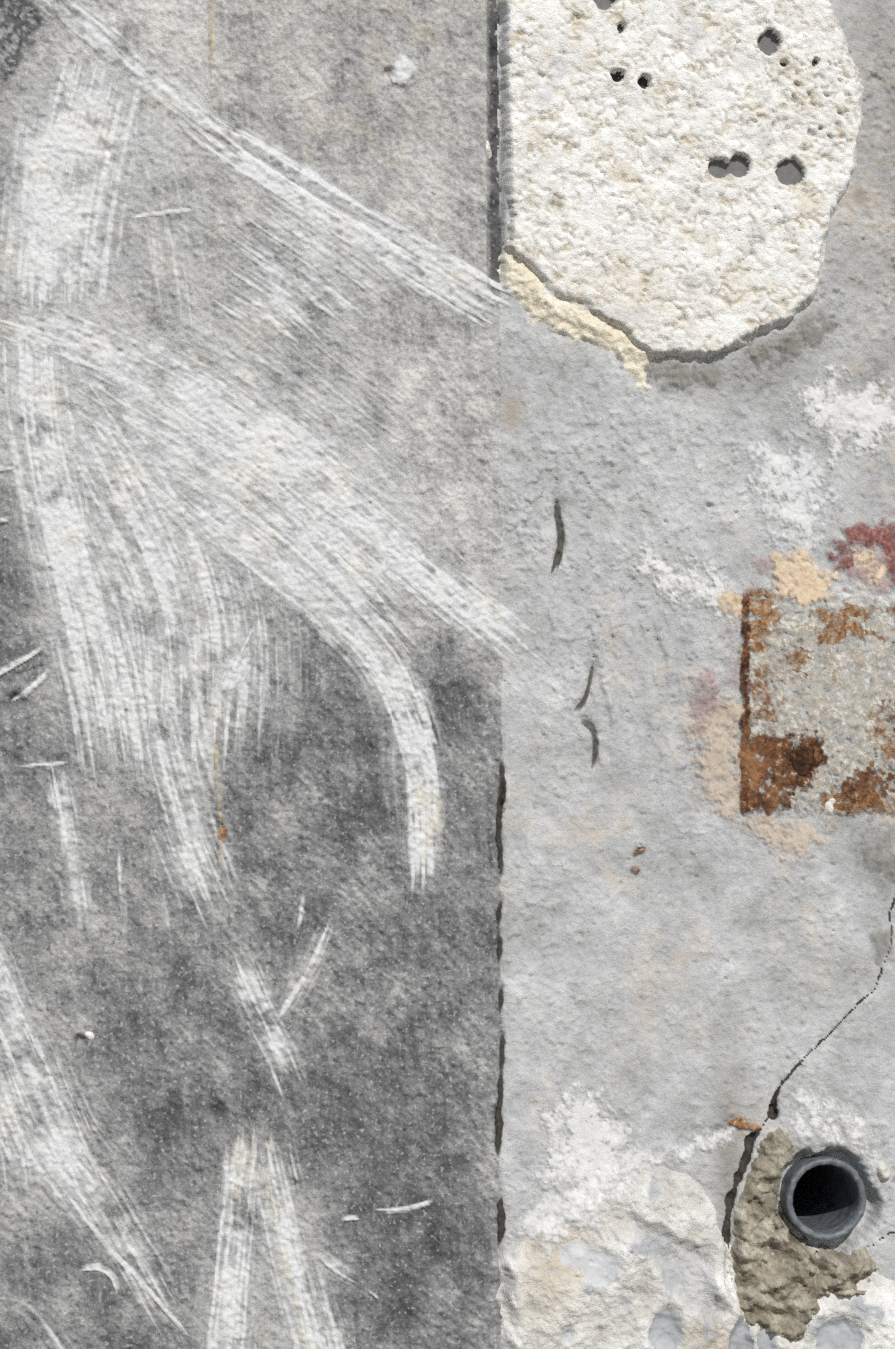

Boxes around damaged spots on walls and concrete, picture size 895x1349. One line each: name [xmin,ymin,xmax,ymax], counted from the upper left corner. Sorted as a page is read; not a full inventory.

rust [736,588,895,825]
crack [722,898,895,1281]
spalling [730,1127,879,1342]